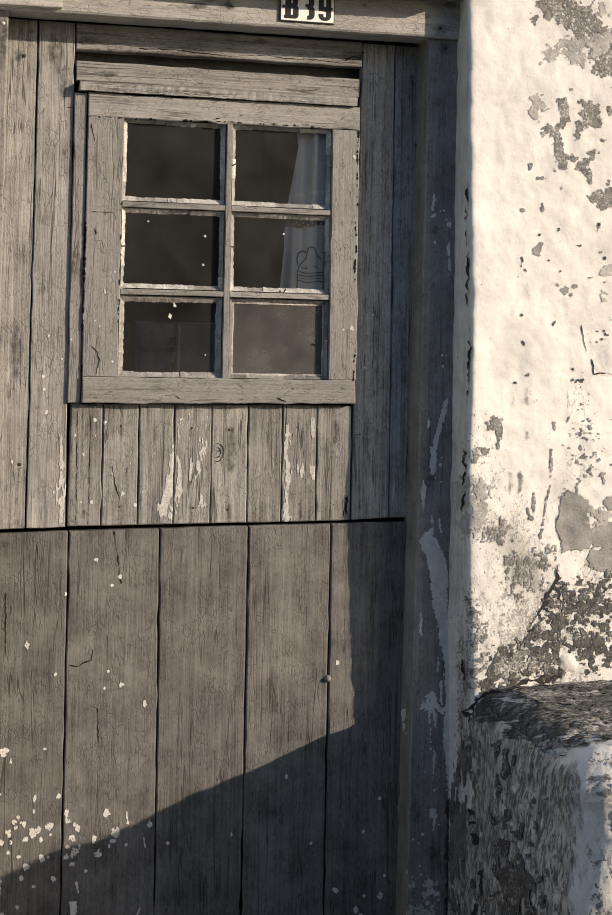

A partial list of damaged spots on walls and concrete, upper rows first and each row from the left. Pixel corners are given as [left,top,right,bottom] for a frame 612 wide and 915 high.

peeling [530,0,612,78]
peeling [528,88,612,211]
flaking render [556,403,612,573]
crack [526,565,562,632]